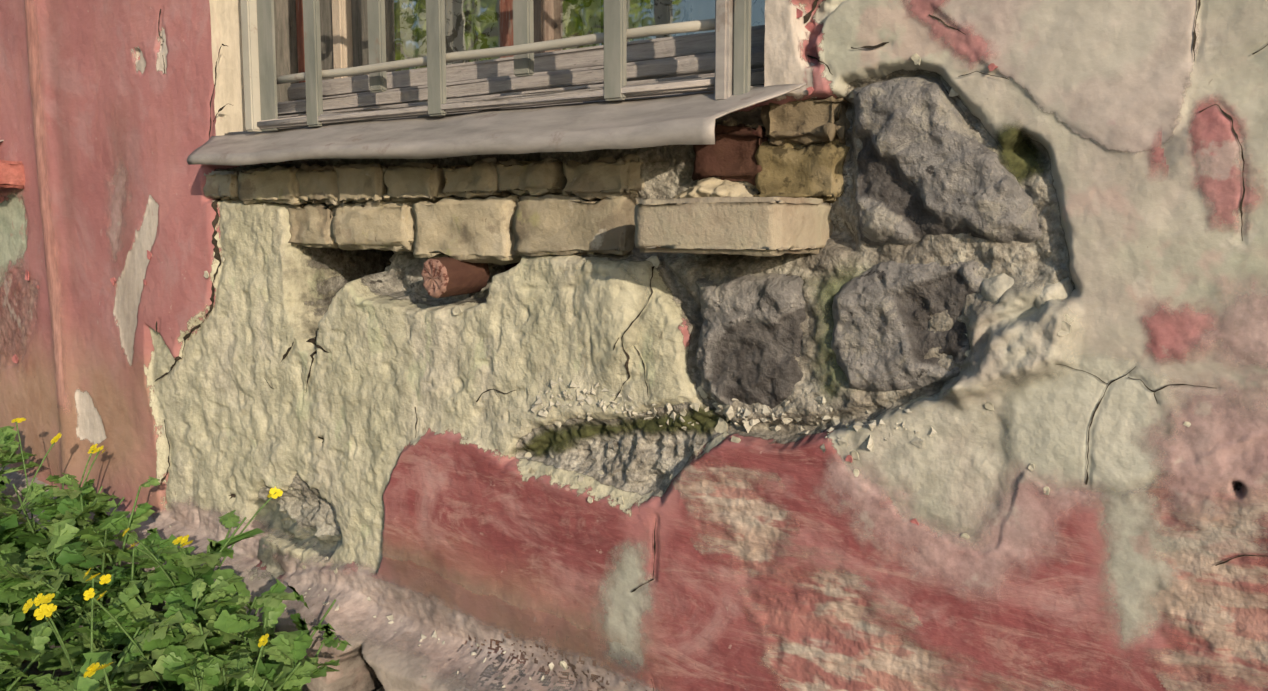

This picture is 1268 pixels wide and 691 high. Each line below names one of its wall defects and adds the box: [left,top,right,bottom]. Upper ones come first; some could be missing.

peeling [131,27,168,74]
crack [1193,0,1201,61]
flaking render [215,145,697,203]
crack [1199,104,1245,241]
peeling [108,164,159,366]
crack [607,266,655,407]
peeling [574,0,1268,691]
peeling [75,389,106,445]
peeling [125,199,722,691]
crack [1057,364,1213,485]
crack [1215,555,1264,566]